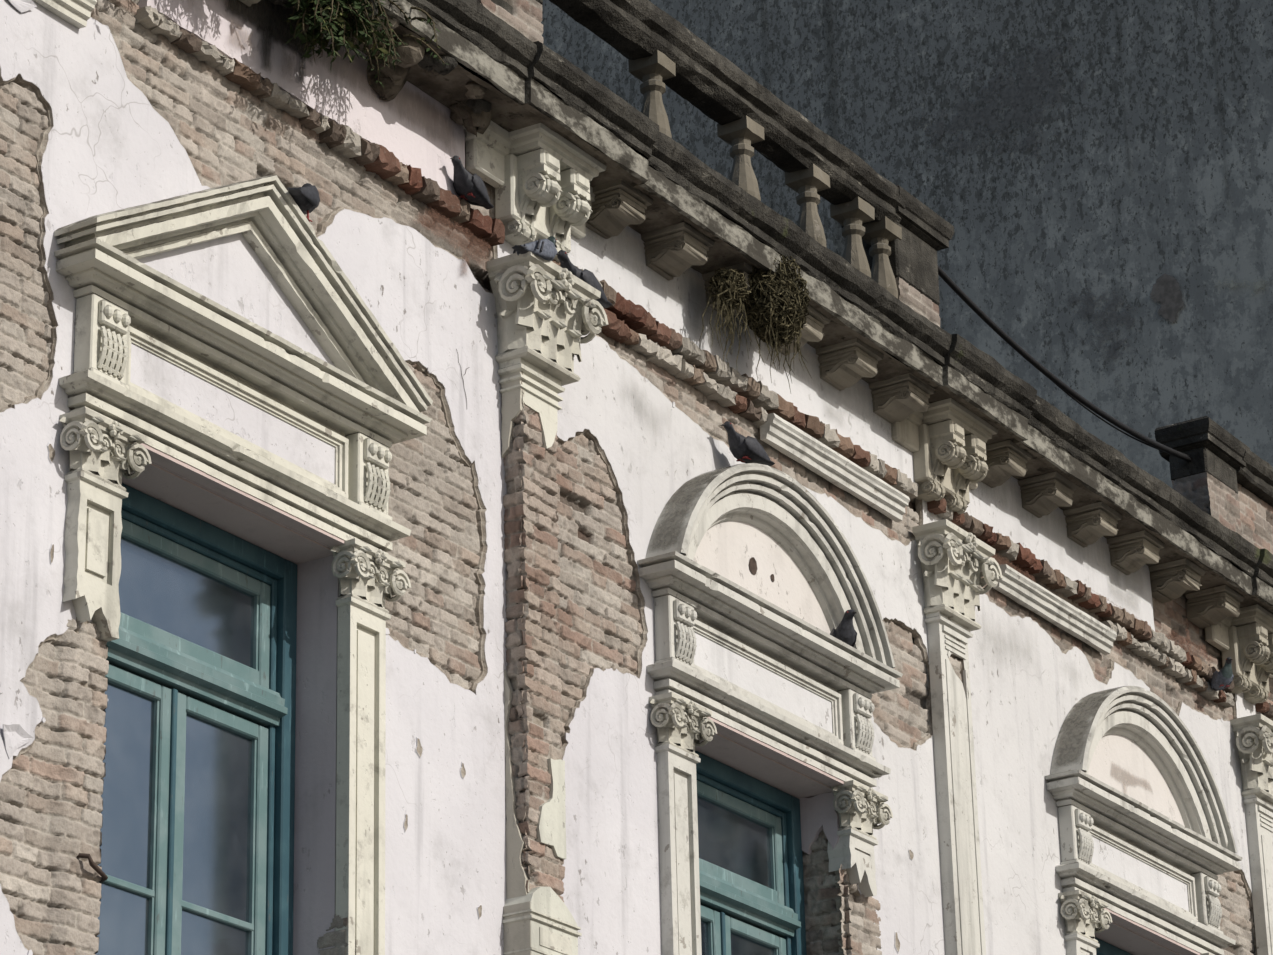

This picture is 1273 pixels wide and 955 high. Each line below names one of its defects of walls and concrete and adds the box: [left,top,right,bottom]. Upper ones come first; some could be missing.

peeling [0,0,37,13]
spalling [0,74,58,413]
spalling [91,0,498,293]